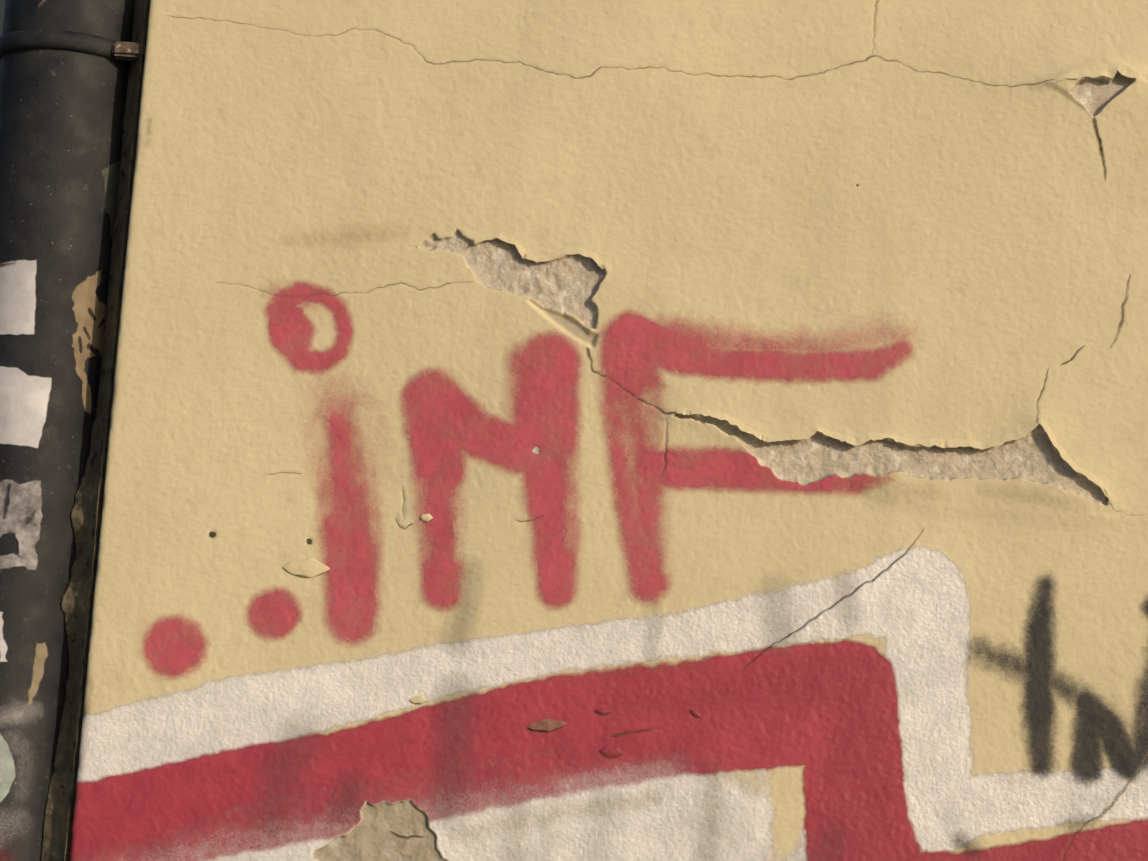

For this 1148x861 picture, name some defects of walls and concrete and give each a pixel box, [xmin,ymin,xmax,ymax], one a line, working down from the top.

crack [424,59,609,78]
spalling [1047,64,1137,116]
spalling [421,230,607,328]
crack [1119,274,1131,330]
peeling [72,270,106,414]
crack [587,347,678,477]
crack [1037,348,1081,424]
spalling [674,408,1112,505]
peeling [26,643,48,708]
spalling [314,800,446,861]
crack [1061,753,1148,860]